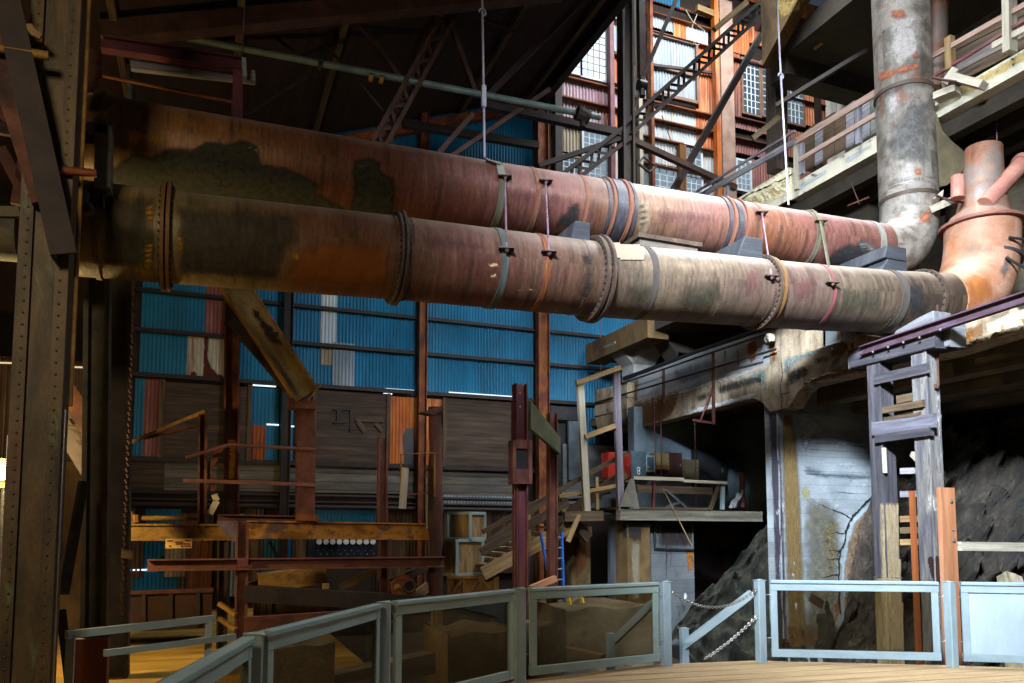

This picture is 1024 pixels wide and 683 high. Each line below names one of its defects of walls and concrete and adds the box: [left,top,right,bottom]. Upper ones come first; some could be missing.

water stain [770,413,870,649]
crack [810,449,872,614]